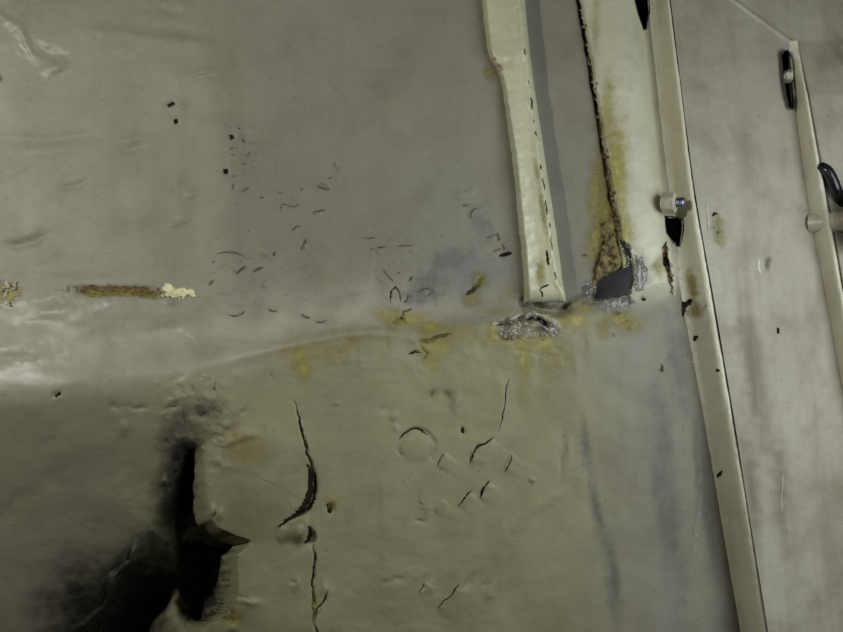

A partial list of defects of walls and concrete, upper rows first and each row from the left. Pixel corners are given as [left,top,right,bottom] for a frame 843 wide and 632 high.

rust [590,135,629,243]
rust [67,285,162,298]
peeling [161,283,196,299]
peeling [662,241,676,295]
peeling [491,309,563,341]
crack [470,381,509,463]
crack [278,400,328,632]
crack [459,481,489,505]